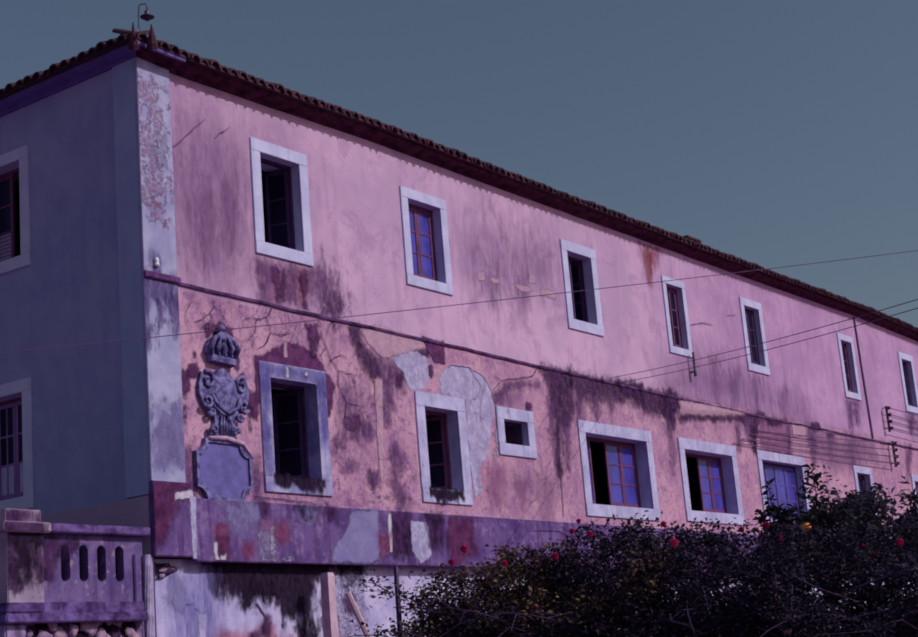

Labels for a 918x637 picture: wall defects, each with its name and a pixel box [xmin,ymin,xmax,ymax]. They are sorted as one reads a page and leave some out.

peeling [138,75,173,226]
water stain [145,255,180,348]
corrosion [643,247,658,284]
water stain [151,352,200,546]
crack [186,300,418,509]
water stain [235,324,479,565]
peeling [361,324,500,496]
water stain [494,366,680,477]
peeling [175,490,197,558]
peeling [213,495,278,560]
water stain [201,562,365,637]
peeling [329,509,381,637]